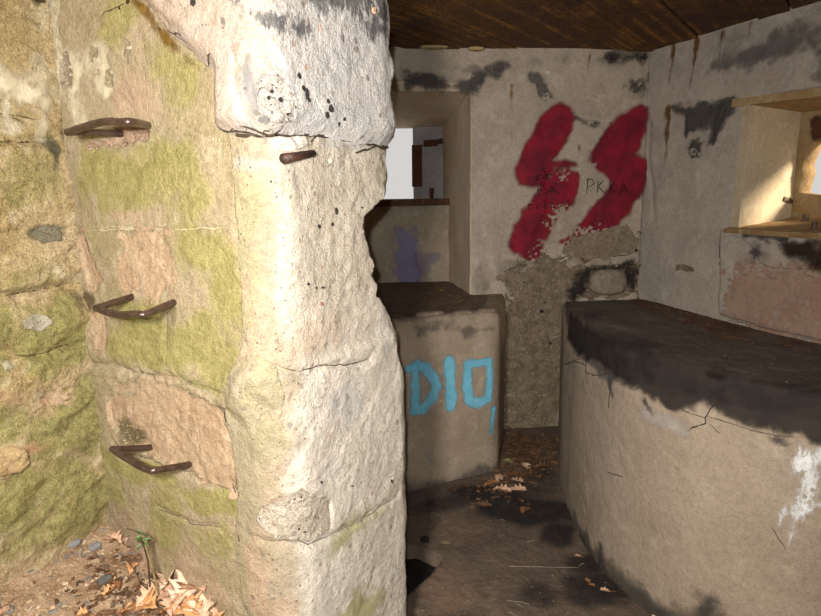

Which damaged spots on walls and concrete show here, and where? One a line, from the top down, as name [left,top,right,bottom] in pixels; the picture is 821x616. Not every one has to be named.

leakage [250,10,315,39]
leakage [306,0,389,46]
leakage [229,57,259,124]
leakage [671,97,735,158]
spalling [496,225,642,429]
peeling [720,261,821,344]
crack [683,404,821,439]
leakage [779,447,821,525]